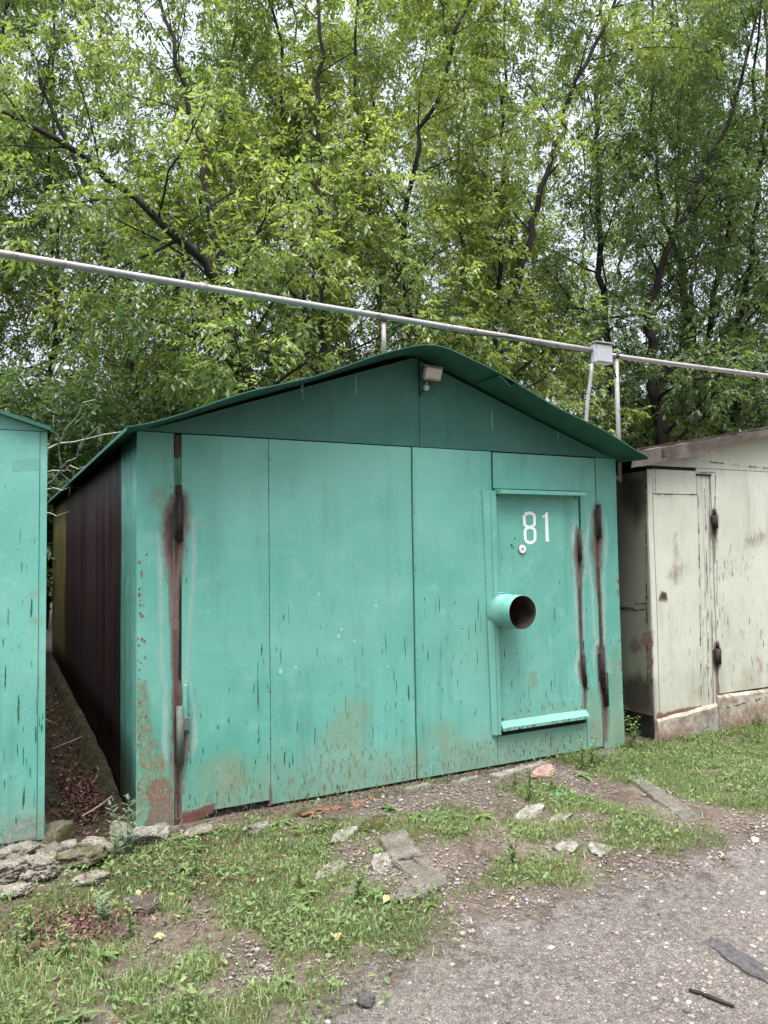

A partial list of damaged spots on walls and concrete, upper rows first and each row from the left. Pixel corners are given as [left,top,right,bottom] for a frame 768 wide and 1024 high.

rust [137,488,214,827]
rust [571,505,623,742]
rust [710,508,718,562]